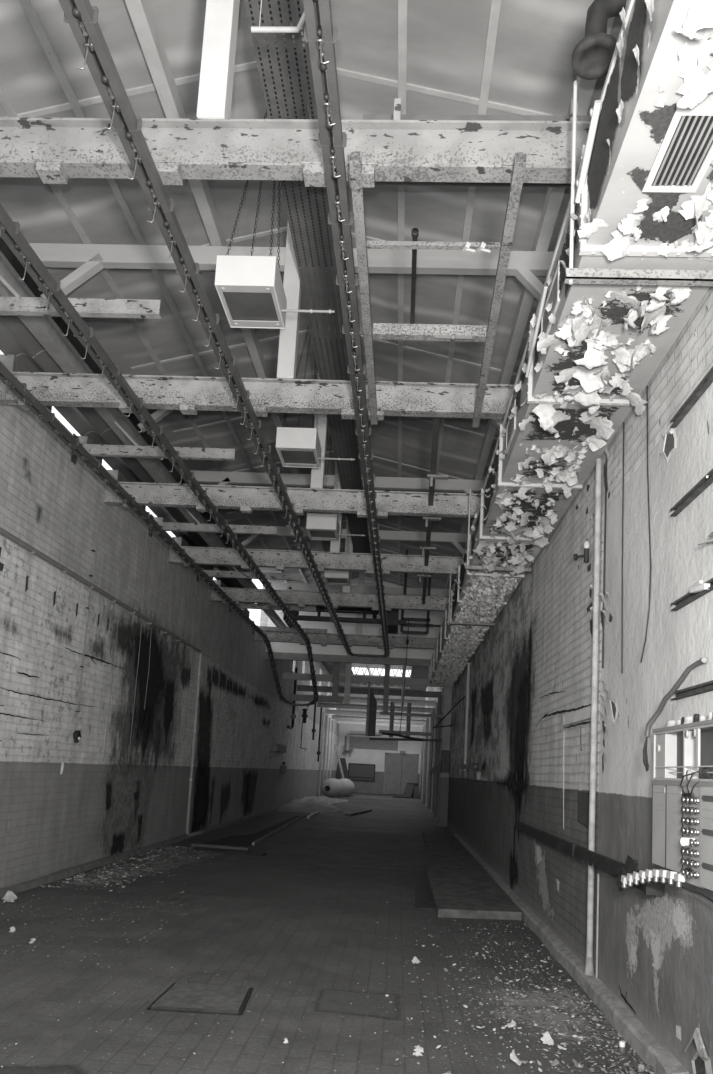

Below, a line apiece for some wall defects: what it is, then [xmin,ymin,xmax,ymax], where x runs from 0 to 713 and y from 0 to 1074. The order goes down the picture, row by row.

peeling [450,0,713,617]
crack [0,652,95,741]
damp [92,616,191,769]
damp [192,683,257,832]
damp [0,1065,84,1074]
peeling [374,906,648,1074]
flaking render [683,1012,712,1074]